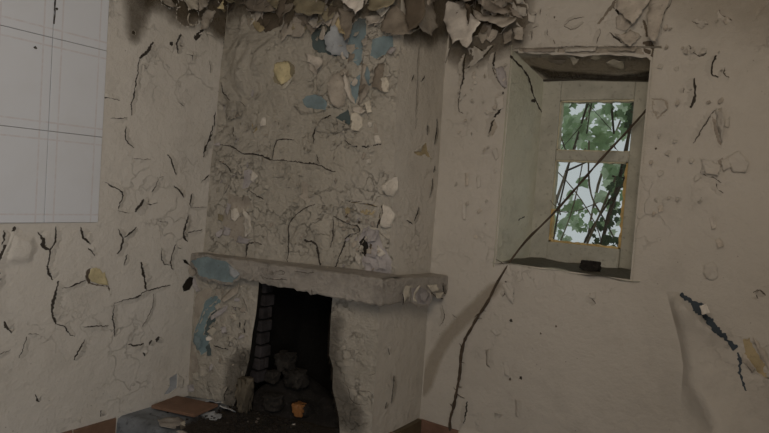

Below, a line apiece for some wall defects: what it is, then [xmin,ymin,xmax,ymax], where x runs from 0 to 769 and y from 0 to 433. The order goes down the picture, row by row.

peeling [161,0,672,134]
crack [0,16,336,361]
crack [259,201,383,295]
crack [406,166,436,224]
spalling [162,260,241,397]
crack [680,292,747,391]